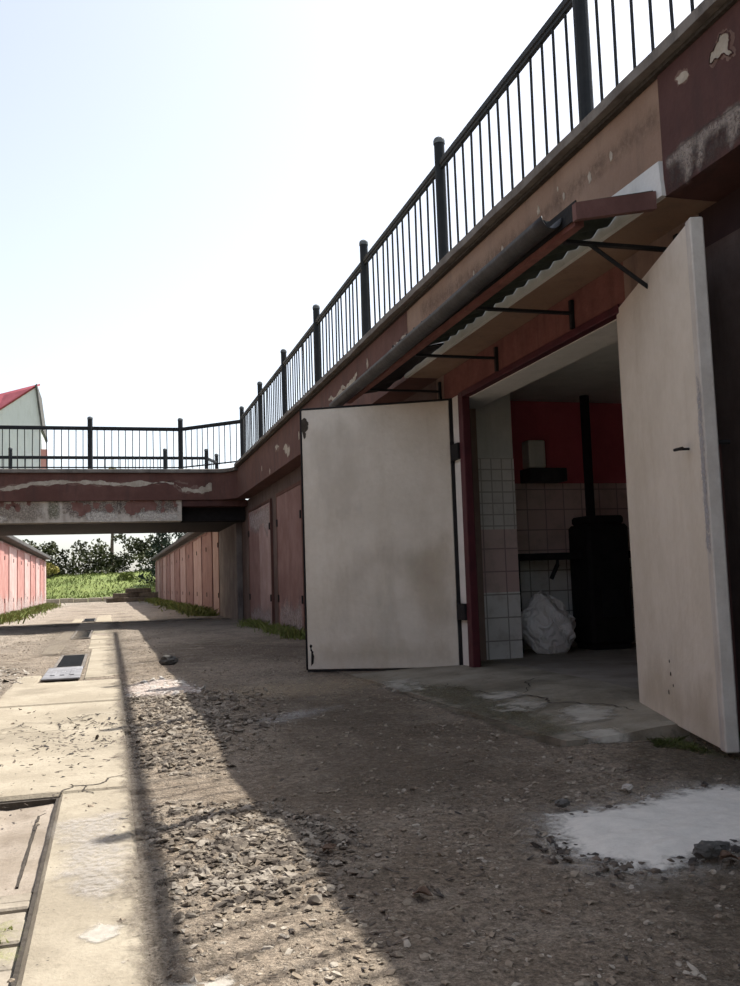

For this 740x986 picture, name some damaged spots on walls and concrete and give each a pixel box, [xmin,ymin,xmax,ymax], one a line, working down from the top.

peeling [709,28,736,68]
peeling [674,68,690,86]
damp [666,103,740,188]
peeling [328,360,368,401]
peeling [275,418,308,457]
peeling [0,480,212,522]
crack [520,676,633,710]
crack [52,773,127,797]